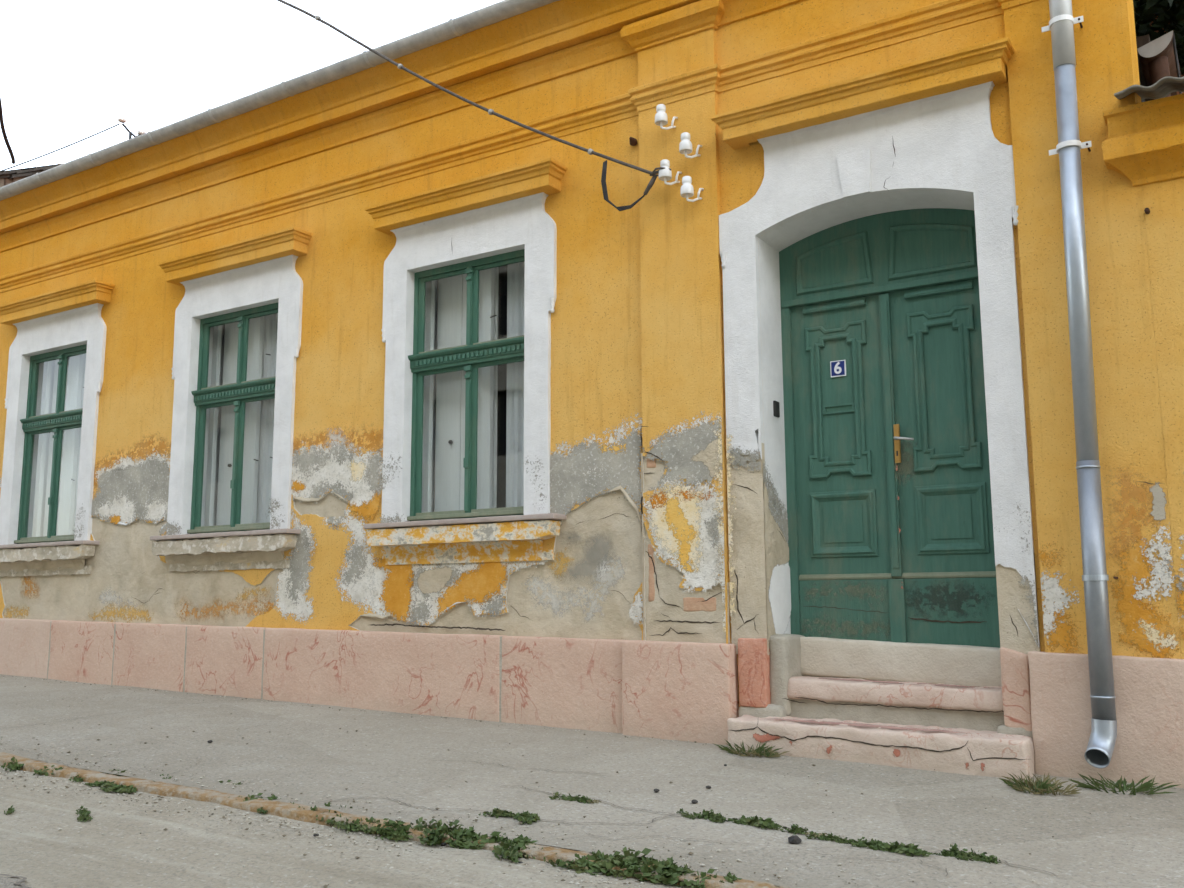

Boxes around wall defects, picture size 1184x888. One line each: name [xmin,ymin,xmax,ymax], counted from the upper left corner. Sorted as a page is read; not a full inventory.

flaking render [1149,482,1167,522]
flaking render [1,411,791,655]
crack [782,697,1004,713]
crack [732,724,1025,761]